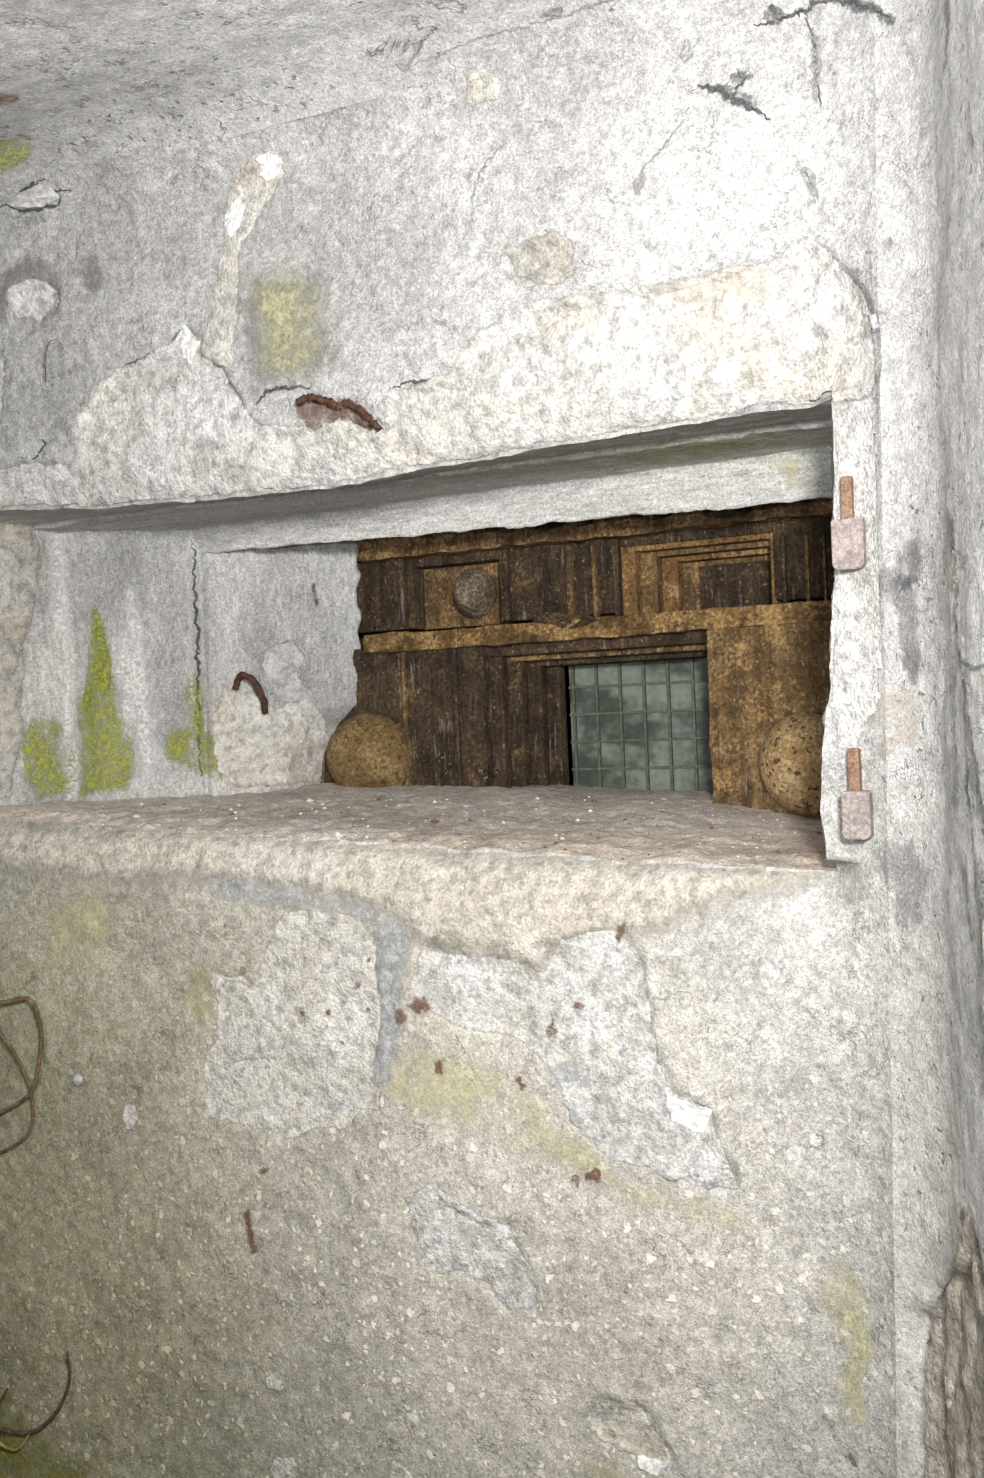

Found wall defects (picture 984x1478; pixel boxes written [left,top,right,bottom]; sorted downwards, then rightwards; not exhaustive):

corrosion [0,93,20,105]
crack [632,69,771,194]
crack [753,0,896,107]
crack [0,178,72,213]
corrosion [293,393,383,432]
spalling [0,150,882,798]
damp [50,535,78,799]
damp [116,591,153,773]
corrosion [244,1209,259,1254]
spalling [923,1207,984,1478]